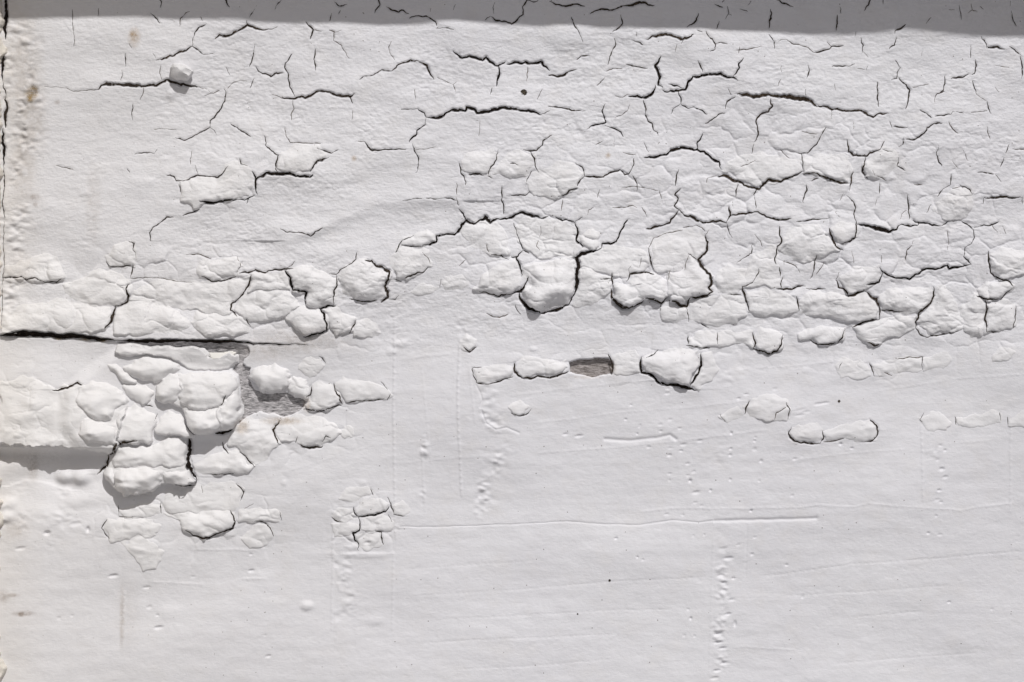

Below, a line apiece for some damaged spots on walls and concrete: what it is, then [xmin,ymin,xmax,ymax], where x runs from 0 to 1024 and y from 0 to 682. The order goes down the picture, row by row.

crack [0,0,1024,391]
peeling [115,341,305,423]
peeling [570,358,612,377]